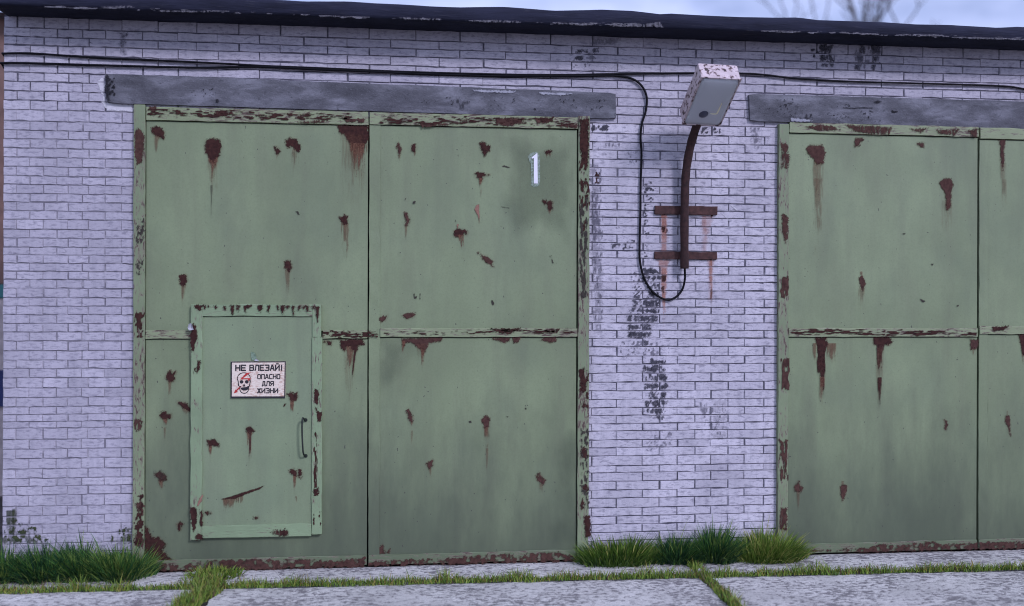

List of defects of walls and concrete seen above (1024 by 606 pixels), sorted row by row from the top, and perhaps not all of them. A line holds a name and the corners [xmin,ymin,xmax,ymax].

corrosion [205,138,222,175]
corrosion [338,125,369,171]
corrosion [579,118,590,171]
corrosion [806,144,826,164]
corrosion [940,178,954,210]
corrosion [194,304,320,323]
corrosion [324,338,365,375]
corrosion [579,368,589,408]
corrosion [813,337,836,394]
corrosion [874,337,892,400]
corrosion [580,429,591,537]
corrosion [144,526,576,572]